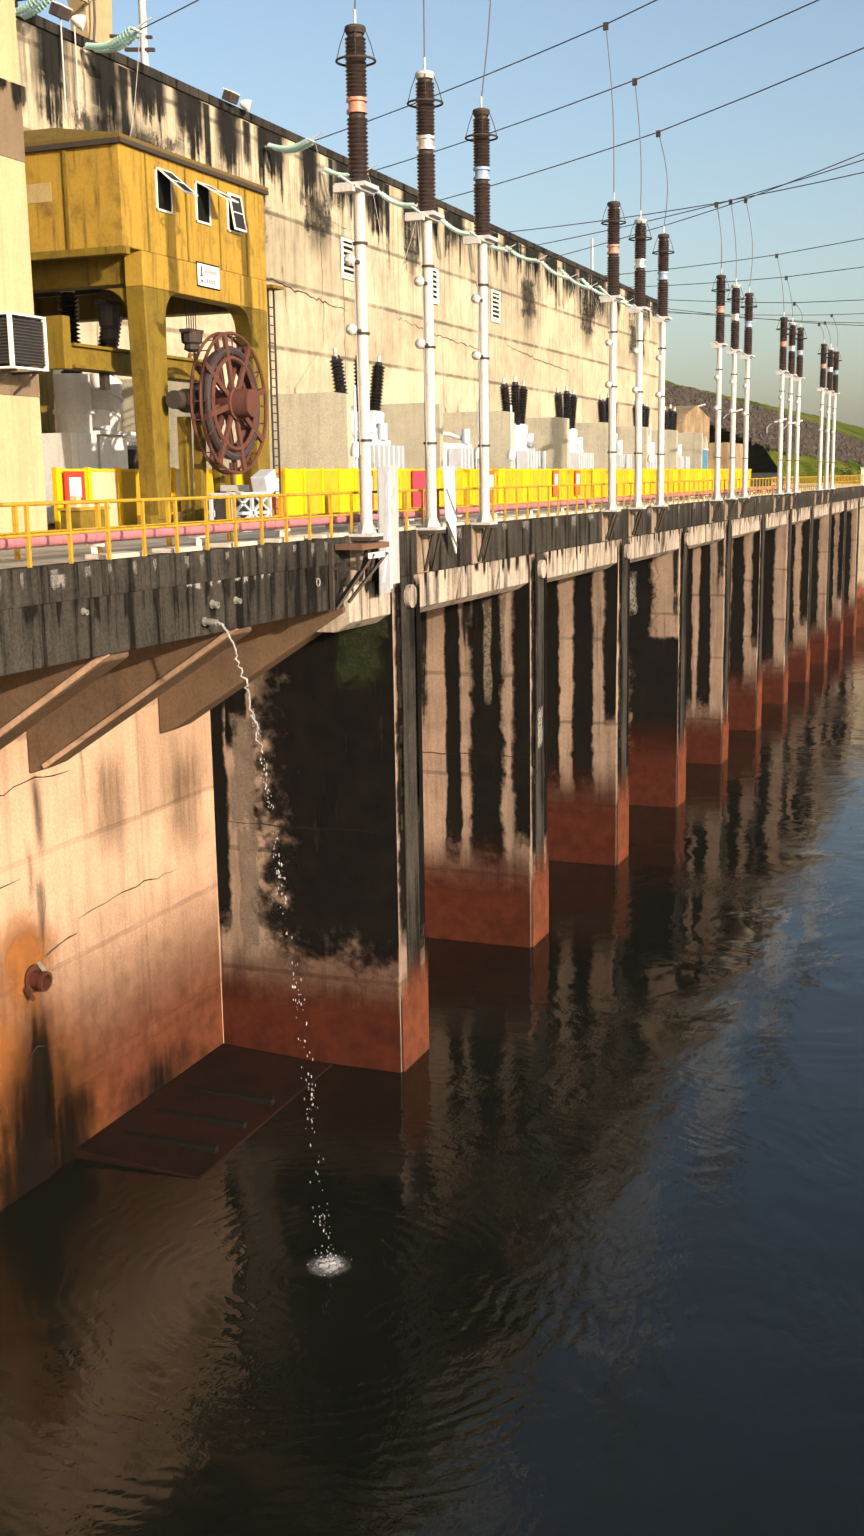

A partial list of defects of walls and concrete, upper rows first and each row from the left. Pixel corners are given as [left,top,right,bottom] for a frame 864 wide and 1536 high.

damp [0,26,464,269]
damp [488,230,658,356]
crack [0,771,67,796]
damp [210,487,860,976]